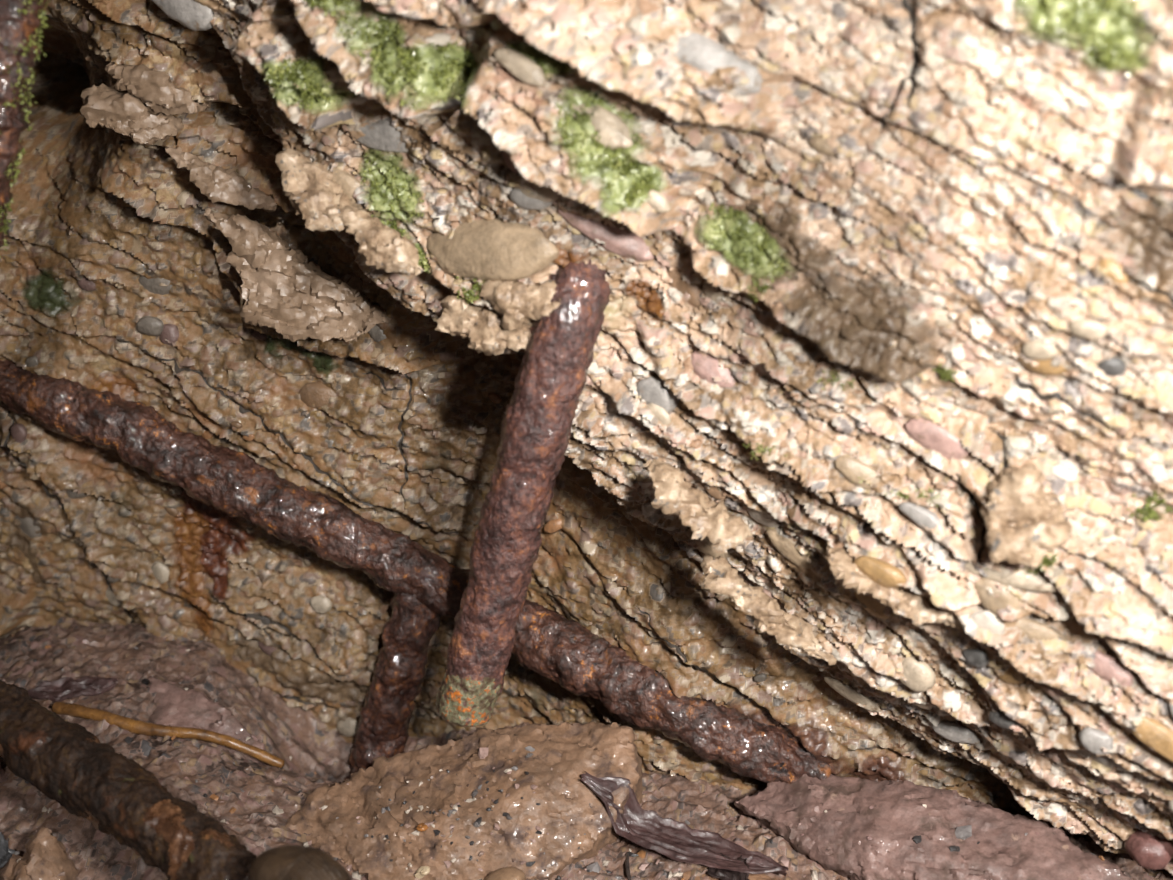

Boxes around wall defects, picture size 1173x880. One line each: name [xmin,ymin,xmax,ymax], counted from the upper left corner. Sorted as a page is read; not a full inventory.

spalling [435,280,561,356]
corrosion [552,247,592,268]
corrosion [623,280,665,321]
corrosion [86,372,143,399]
crack [2,402,67,515]
crack [117,339,466,534]
crack [83,546,146,627]
corrosion [172,489,255,638]
spalling [641,459,837,665]
spalling [825,542,962,629]
crack [208,591,349,678]
crack [279,694,334,708]